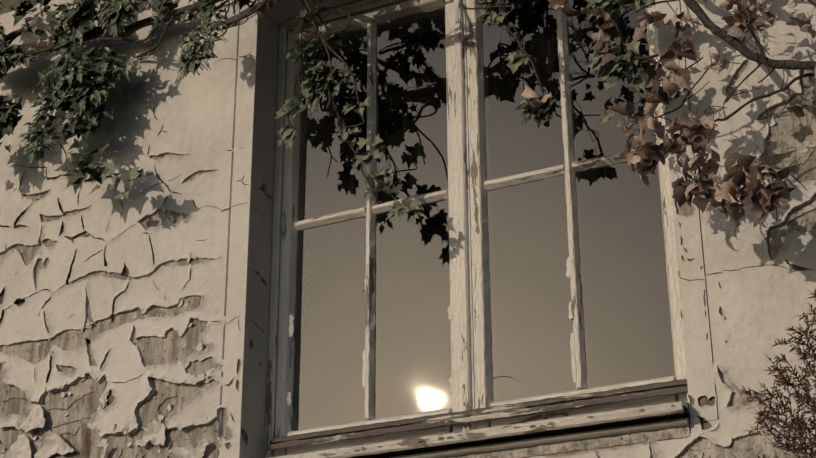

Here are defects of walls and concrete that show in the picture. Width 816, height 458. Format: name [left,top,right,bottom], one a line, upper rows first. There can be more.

peeling [749,70,816,265]
peeling [0,221,60,292]
crack [0,99,267,331]
peeling [105,193,197,246]
spalling [673,199,703,270]
crack [226,314,268,336]
crack [31,347,58,390]
crack [84,338,147,387]
peeling [0,279,248,458]
peeling [642,360,814,458]